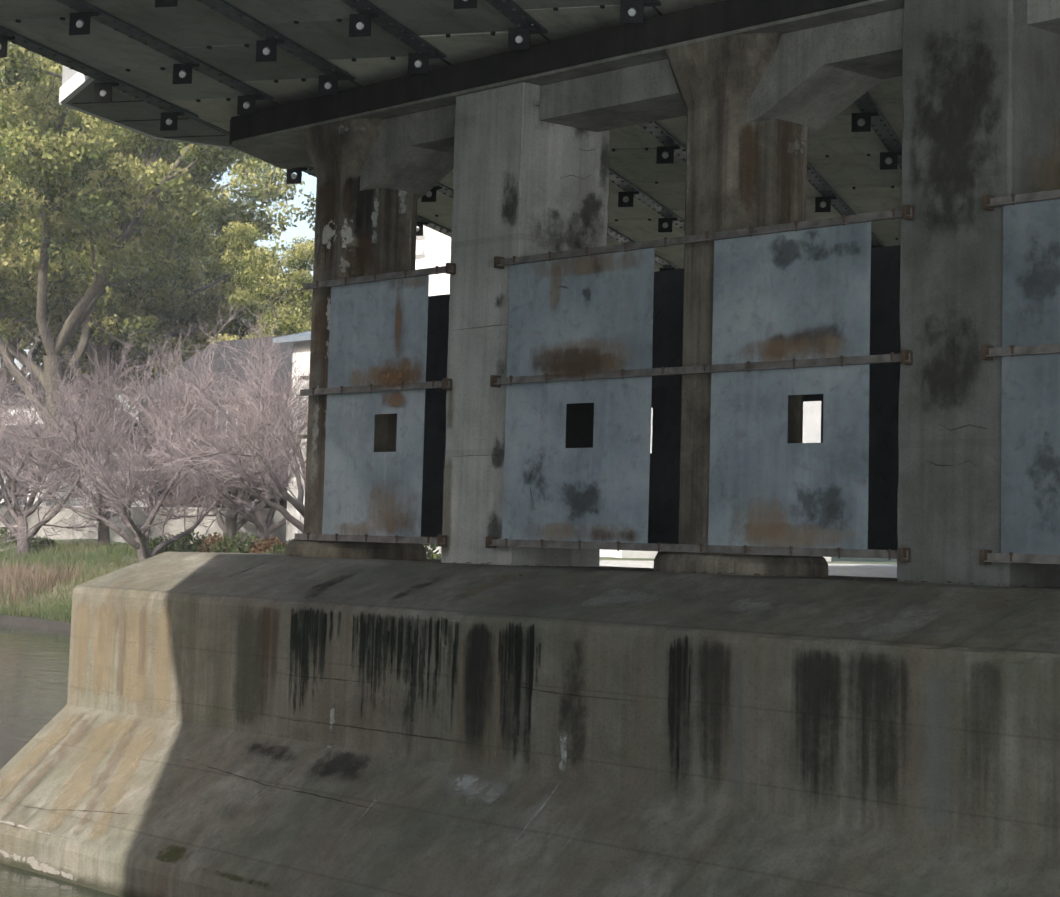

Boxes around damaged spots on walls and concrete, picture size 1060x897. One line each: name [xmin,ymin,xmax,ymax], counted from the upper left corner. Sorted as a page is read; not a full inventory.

peeling [322,218,354,274]
rust [374,300,418,406]
damp [314,746,367,778]
damp [289,608,541,753]
damp [668,637,729,771]
damp [796,652,906,792]